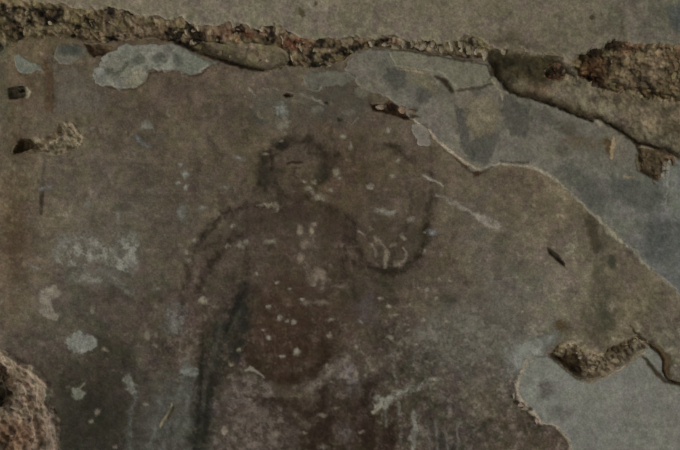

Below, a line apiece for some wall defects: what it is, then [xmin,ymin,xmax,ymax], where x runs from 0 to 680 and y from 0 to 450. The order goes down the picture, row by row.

peeling [0,0,680,297]
spalling [0,348,61,450]
spalling [515,358,571,450]